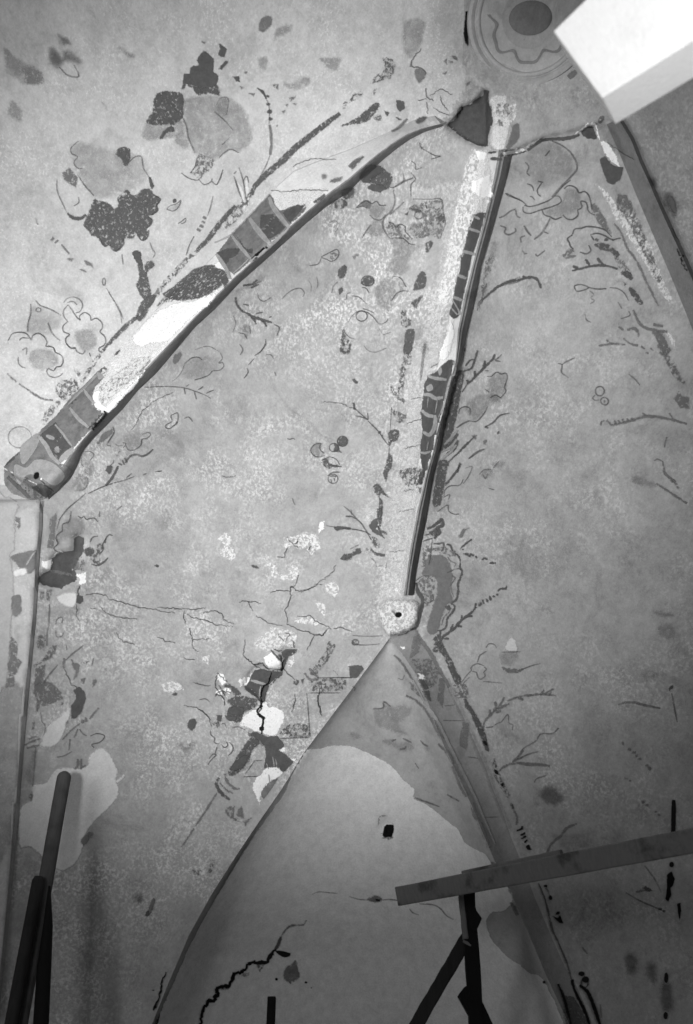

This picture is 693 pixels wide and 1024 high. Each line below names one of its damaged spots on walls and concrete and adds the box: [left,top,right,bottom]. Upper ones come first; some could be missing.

flaking render [0,156,364,692]
flaking render [379,90,525,636]
peeling [32,635,86,729]
crack [86,537,350,736]
crack [199,920,307,1024]